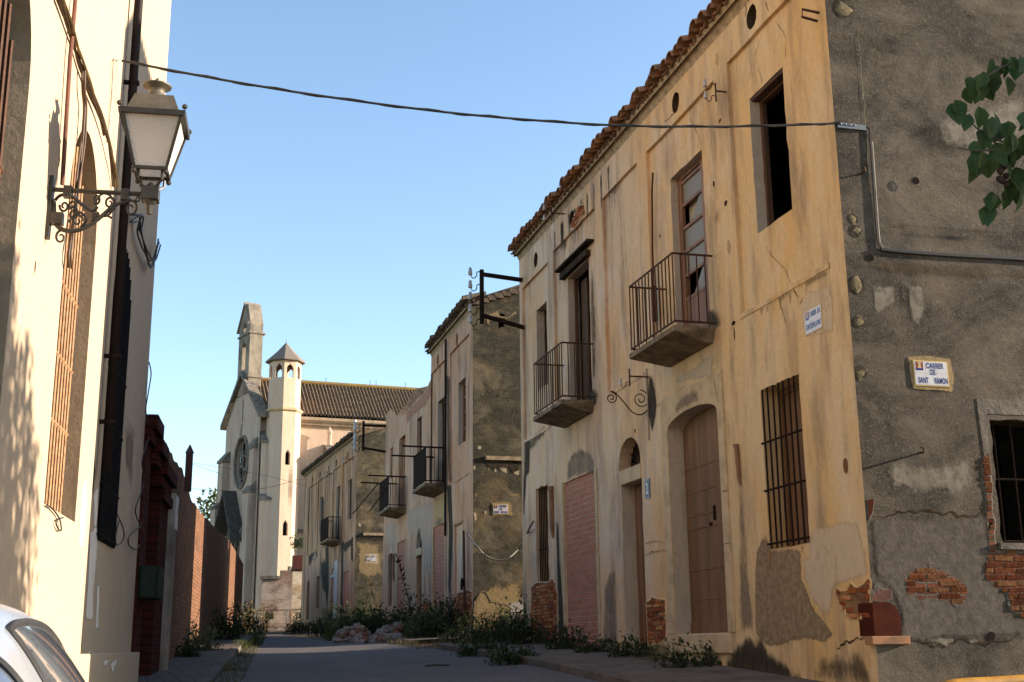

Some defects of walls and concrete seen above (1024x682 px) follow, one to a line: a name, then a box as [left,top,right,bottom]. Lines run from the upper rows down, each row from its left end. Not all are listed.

leakage [487,428,544,516]
crack [875,509,986,518]
spalling [891,453,1024,617]
spalling [453,578,559,642]
spalling [646,596,667,654]
spalling [835,577,892,620]
leakage [727,508,1024,676]